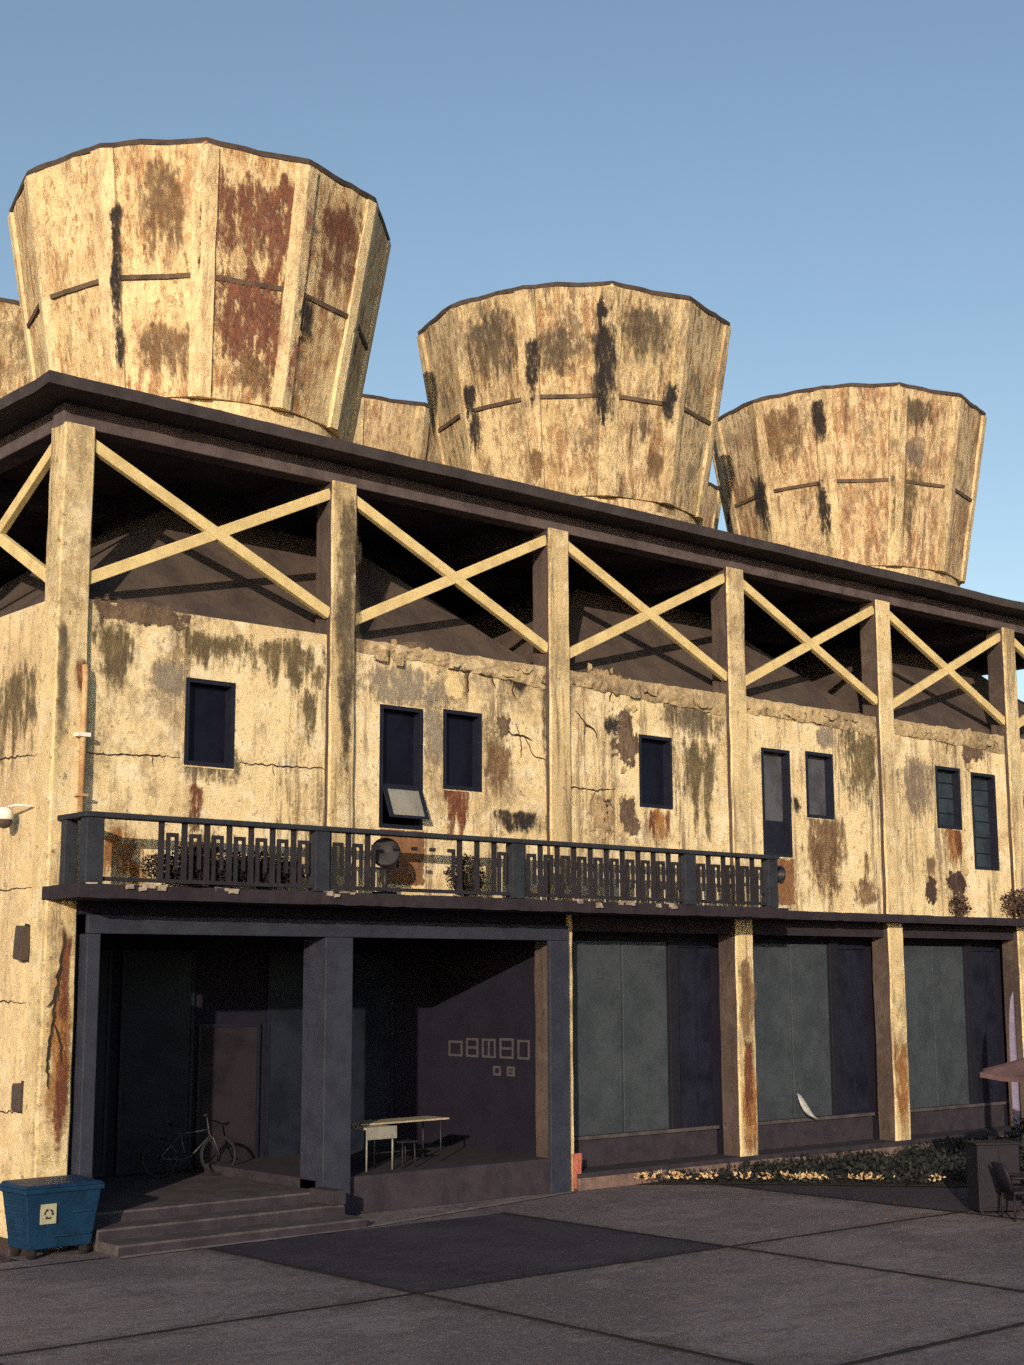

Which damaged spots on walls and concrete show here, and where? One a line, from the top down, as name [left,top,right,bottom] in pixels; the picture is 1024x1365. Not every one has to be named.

water stain [109,202,125,368]
corrosion [136,160,366,407]
water stain [463,309,576,454]
water stain [591,292,675,429]
water stain [152,500,361,776]
corrosion [444,790,469,841]
crack [448,668,665,761]
crack [571,786,613,821]
peeling [572,663,632,689]
peeling [610,705,643,773]
corrosion [45,928,72,1163]
corrosion [738,959,758,1152]